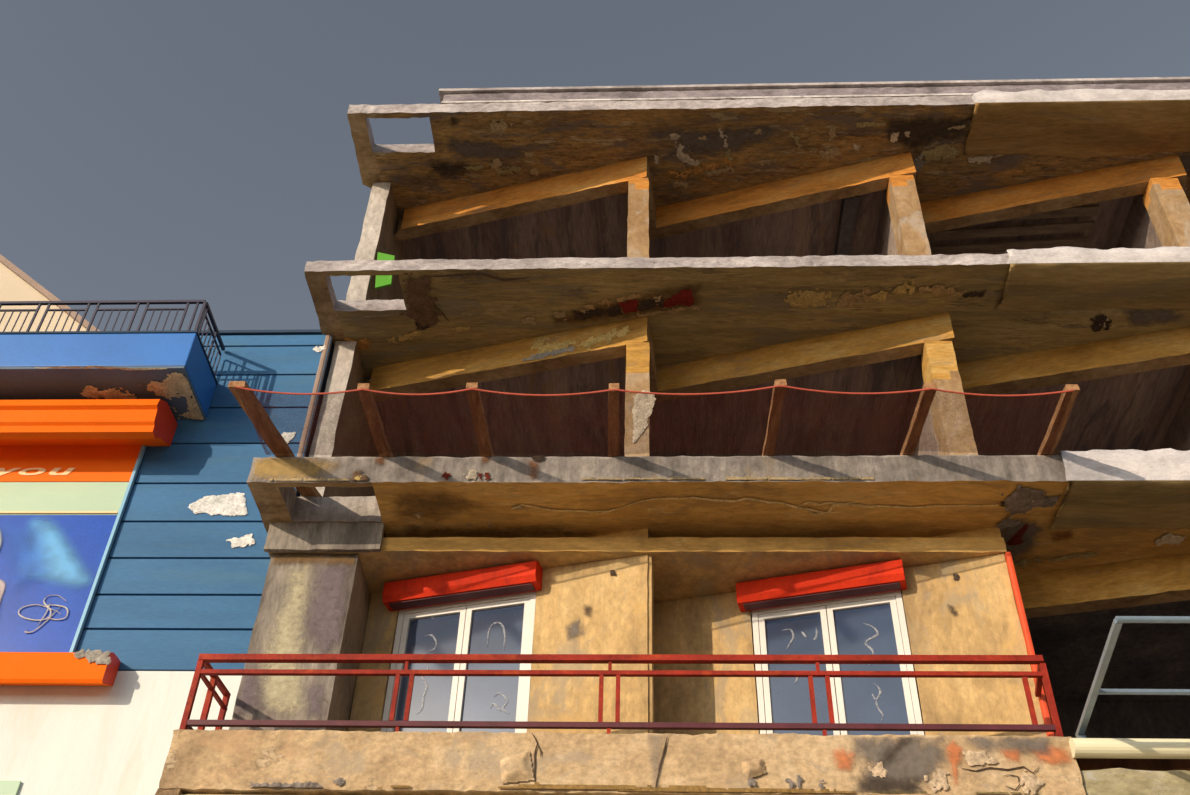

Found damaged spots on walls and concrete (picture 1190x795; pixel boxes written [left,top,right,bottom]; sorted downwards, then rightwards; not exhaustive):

leakage [653,128,772,166]
leakage [1179,154,1190,175]
spalling [387,272,442,343]
spalling [521,285,700,362]
peeling [35,366,203,420]
peeling [188,492,247,516]
crack [511,497,998,515]
peeling [226,534,255,548]
crack [532,733,542,780]
crack [649,734,667,790]
leakage [498,737,942,793]
leakage [970,737,1047,753]